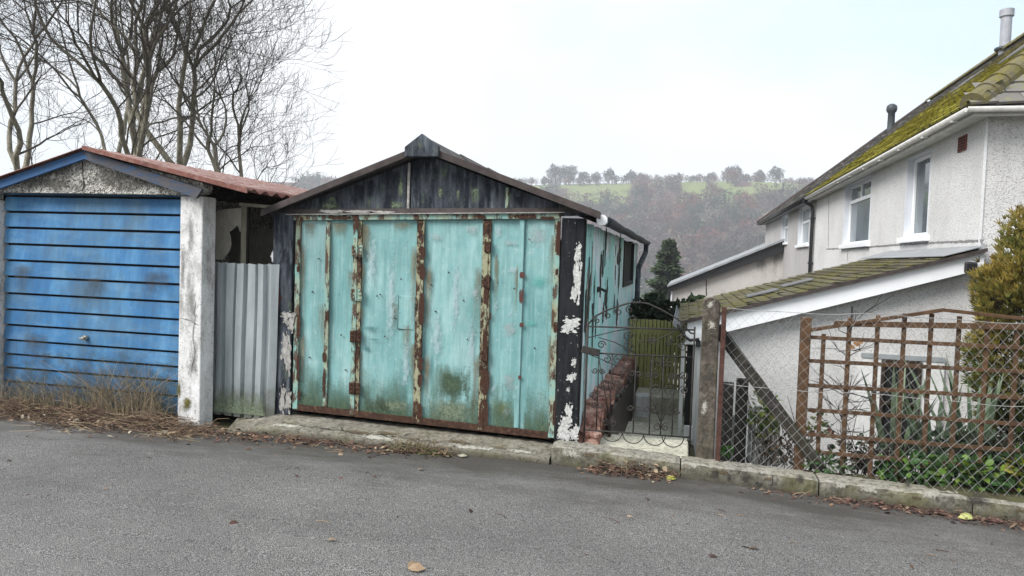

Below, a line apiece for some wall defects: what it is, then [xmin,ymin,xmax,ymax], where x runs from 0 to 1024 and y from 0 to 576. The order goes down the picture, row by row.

peeling [279,311,297,415]
rust [406,245,431,387]
rust [475,252,498,428]
peeling [557,228,622,442]